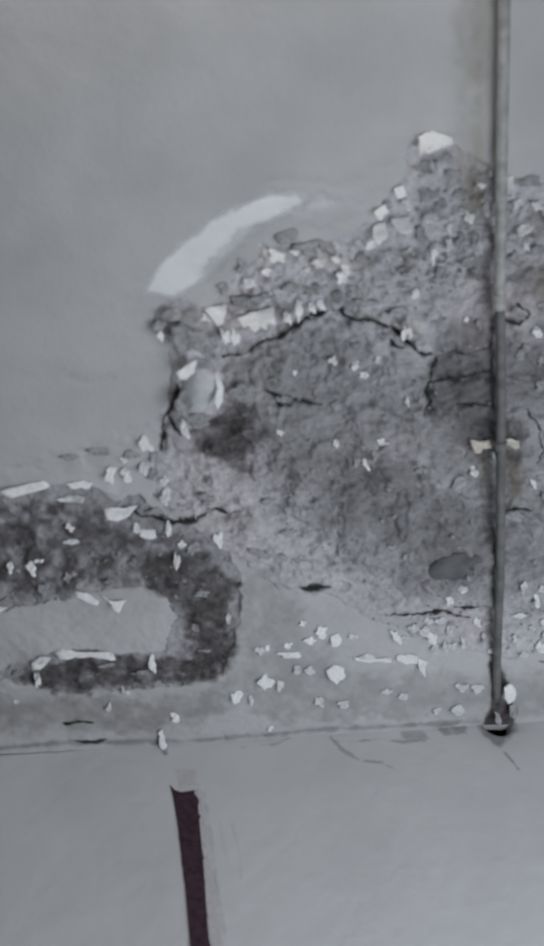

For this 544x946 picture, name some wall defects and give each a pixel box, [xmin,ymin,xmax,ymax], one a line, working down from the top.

crack [222,307,492,416]
spalling [0,130,544,745]
peeling [158,730,167,754]